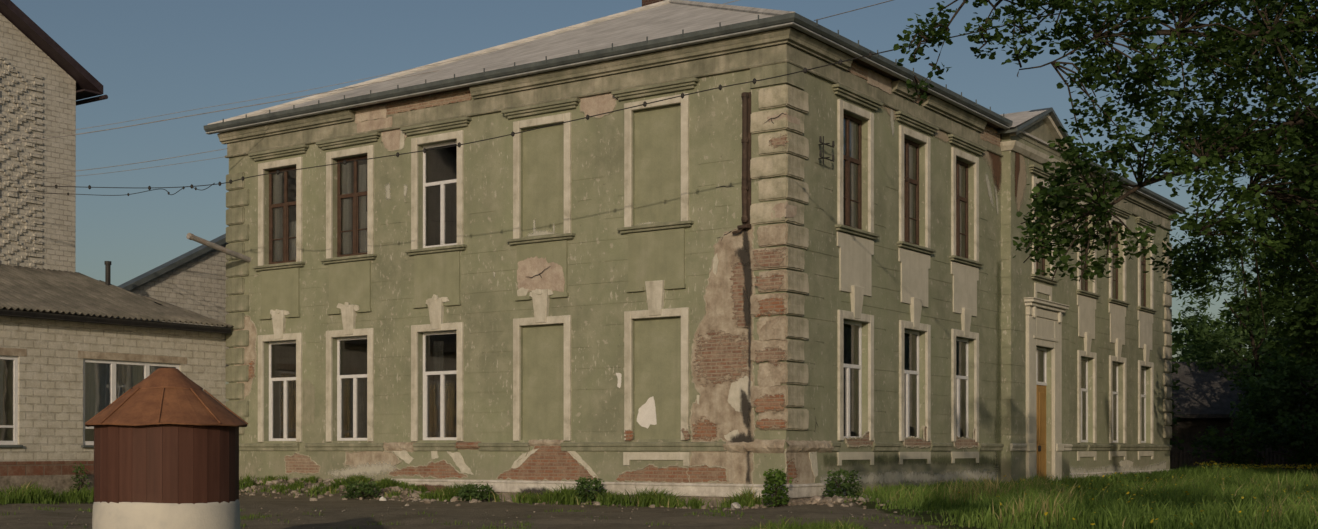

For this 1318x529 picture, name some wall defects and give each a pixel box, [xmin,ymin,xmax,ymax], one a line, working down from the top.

flaking render [517,256,565,297]
flaking render [615,202,797,484]
flaking render [344,450,474,479]
flaking render [496,438,598,481]